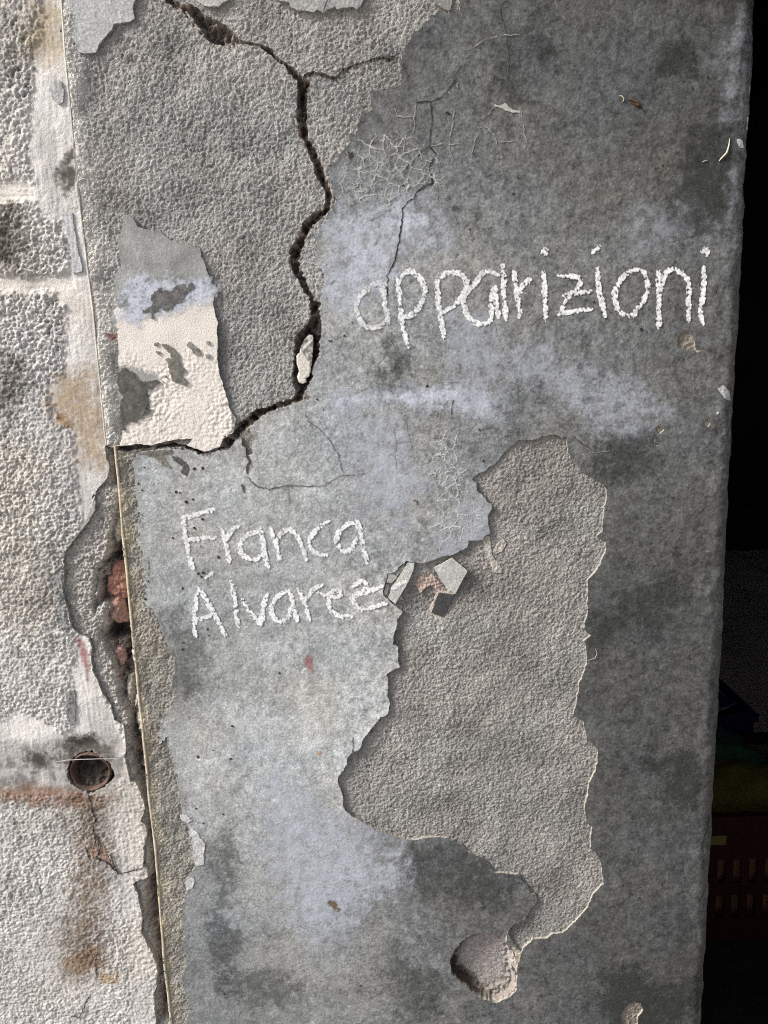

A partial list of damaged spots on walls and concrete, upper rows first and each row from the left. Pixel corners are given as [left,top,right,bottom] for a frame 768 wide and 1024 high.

peeling [50,0,460,476]
crack [107,0,527,504]
flaking render [66,689,76,725]
flaking render [49,500,97,632]
crack [86,794,144,875]
peeling [338,435,606,1001]